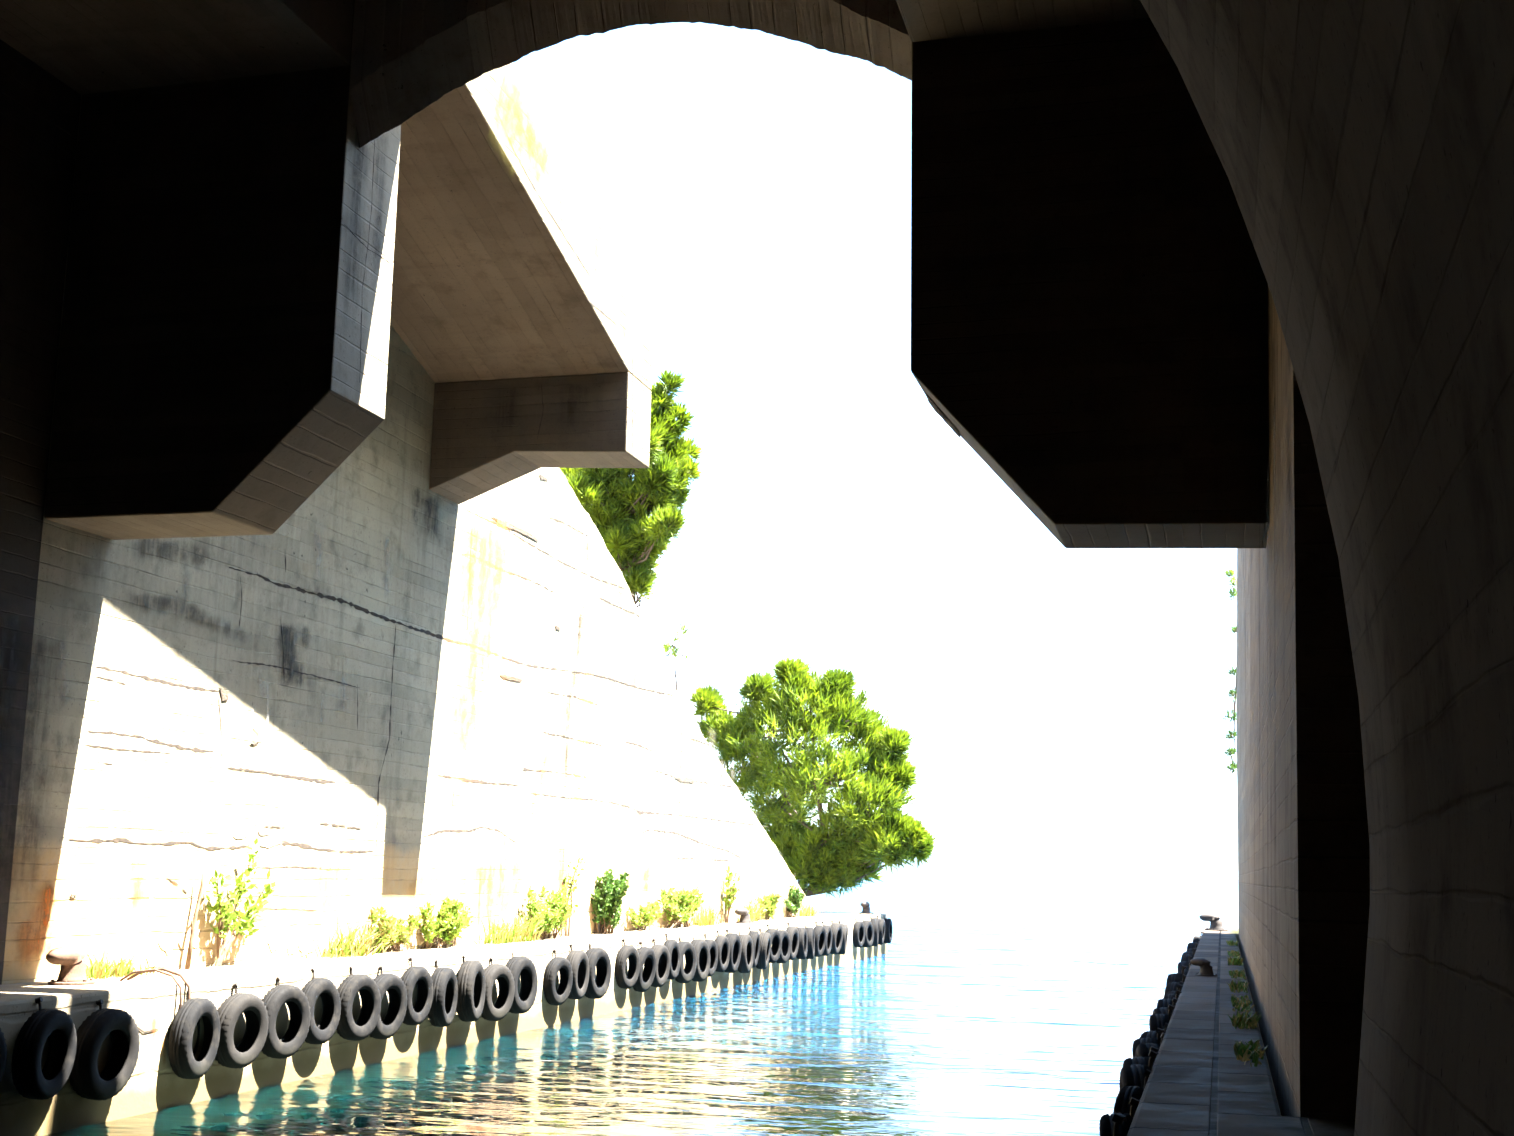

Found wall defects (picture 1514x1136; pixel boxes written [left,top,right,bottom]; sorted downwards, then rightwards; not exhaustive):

water stain [283,628,307,682]
corrosion [454,523,504,747]
crack [63,509,768,897]
crack [265,905,317,913]
corrosion [463,860,520,923]